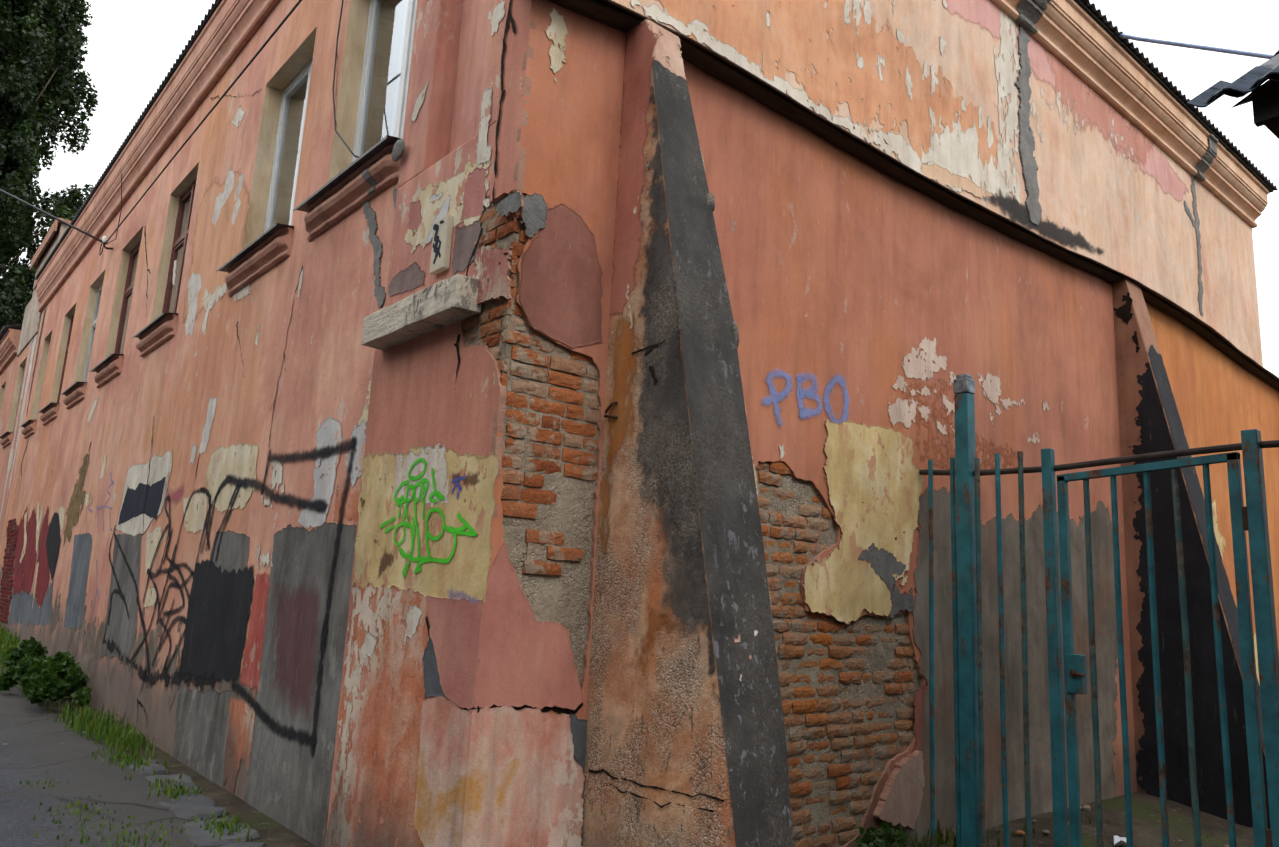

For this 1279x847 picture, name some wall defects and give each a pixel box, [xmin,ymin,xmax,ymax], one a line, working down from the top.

peeling [232,106,245,127]
crack [466,0,516,276]
peeling [172,169,251,336]
crack [426,698,583,715]
crack [588,769,724,812]